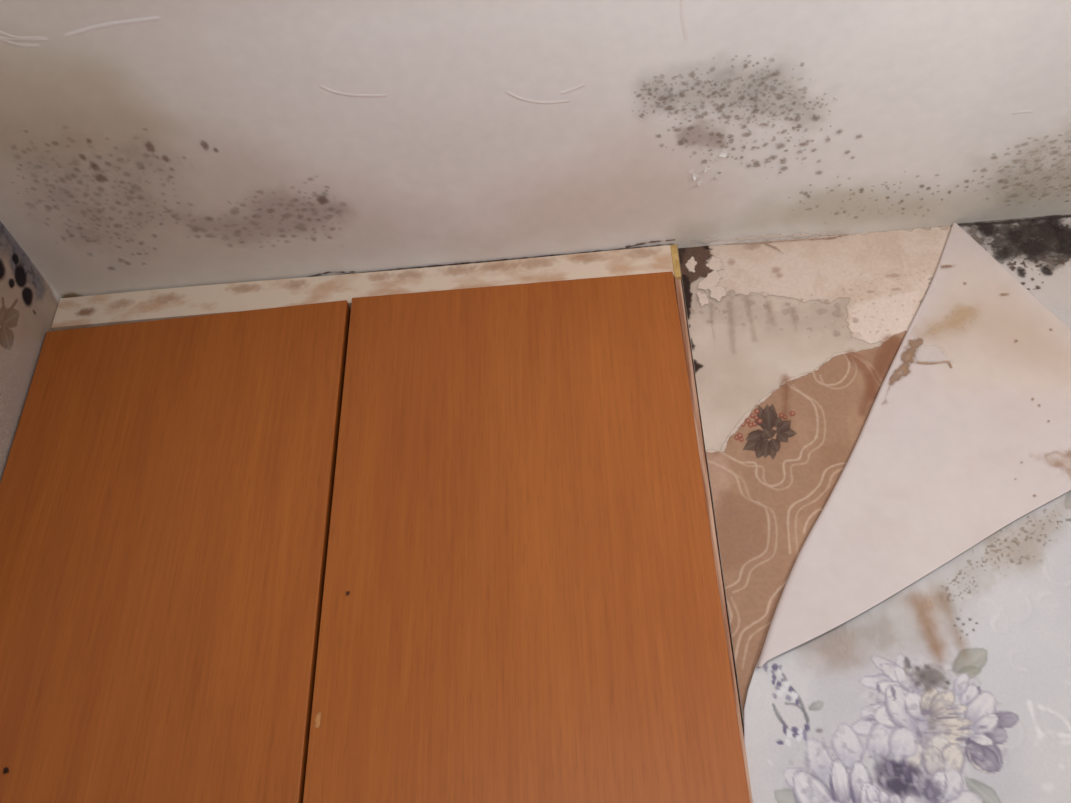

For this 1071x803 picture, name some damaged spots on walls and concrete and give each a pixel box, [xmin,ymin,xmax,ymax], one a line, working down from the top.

leakage [638,72,816,173]
flaking render [686,226,952,344]
leakage [958,215,1071,290]